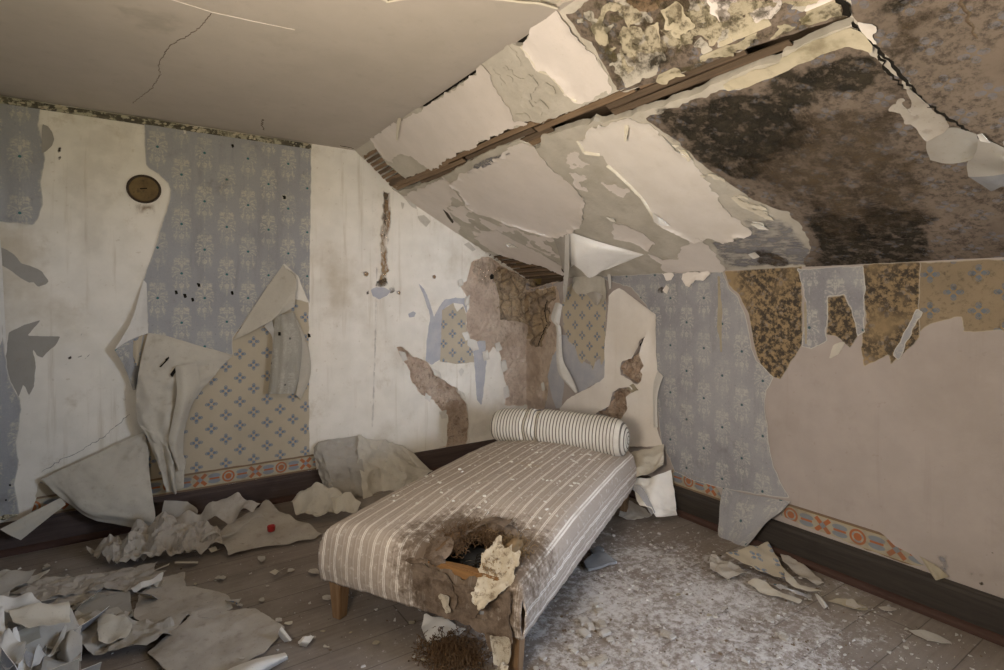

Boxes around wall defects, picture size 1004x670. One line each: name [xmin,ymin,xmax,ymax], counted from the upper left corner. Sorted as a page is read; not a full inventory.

crack [136,0,294,100]
damp [582,0,740,78]
crack [835,0,969,131]
peeling [364,0,846,420]
damp [658,55,935,267]
peeling [889,88,1004,191]
spalling [397,347,469,447]